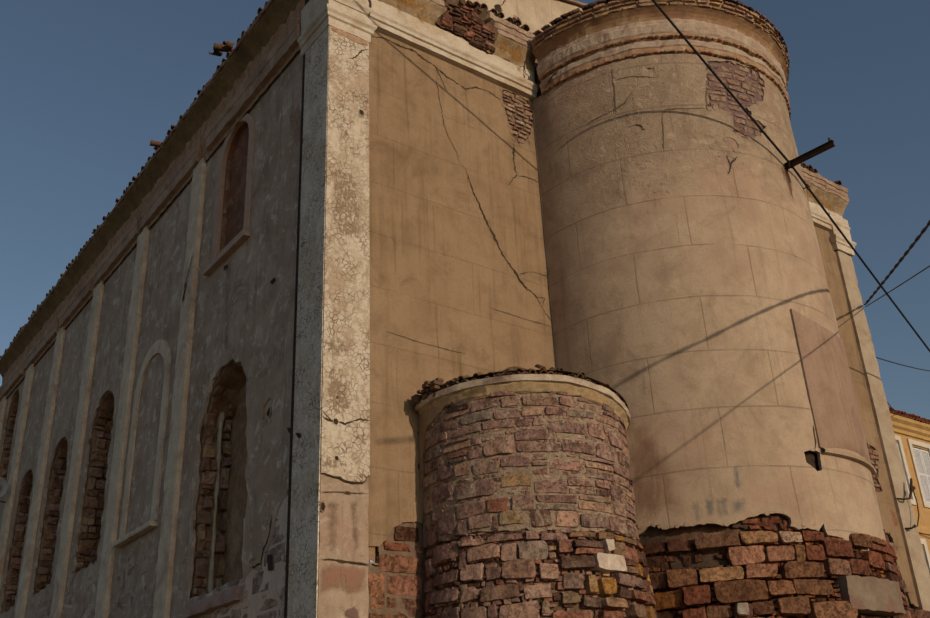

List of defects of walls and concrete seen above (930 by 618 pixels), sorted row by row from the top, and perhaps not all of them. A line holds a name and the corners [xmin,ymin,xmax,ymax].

flaking render [440,2,496,53]
flaking render [500,89,533,146]
crack [524,55,567,88]
crack [588,69,657,124]
crack [662,88,708,148]
flaking render [705,60,765,140]
crack [349,0,552,327]
crack [324,413,370,425]
flaking render [866,441,882,494]